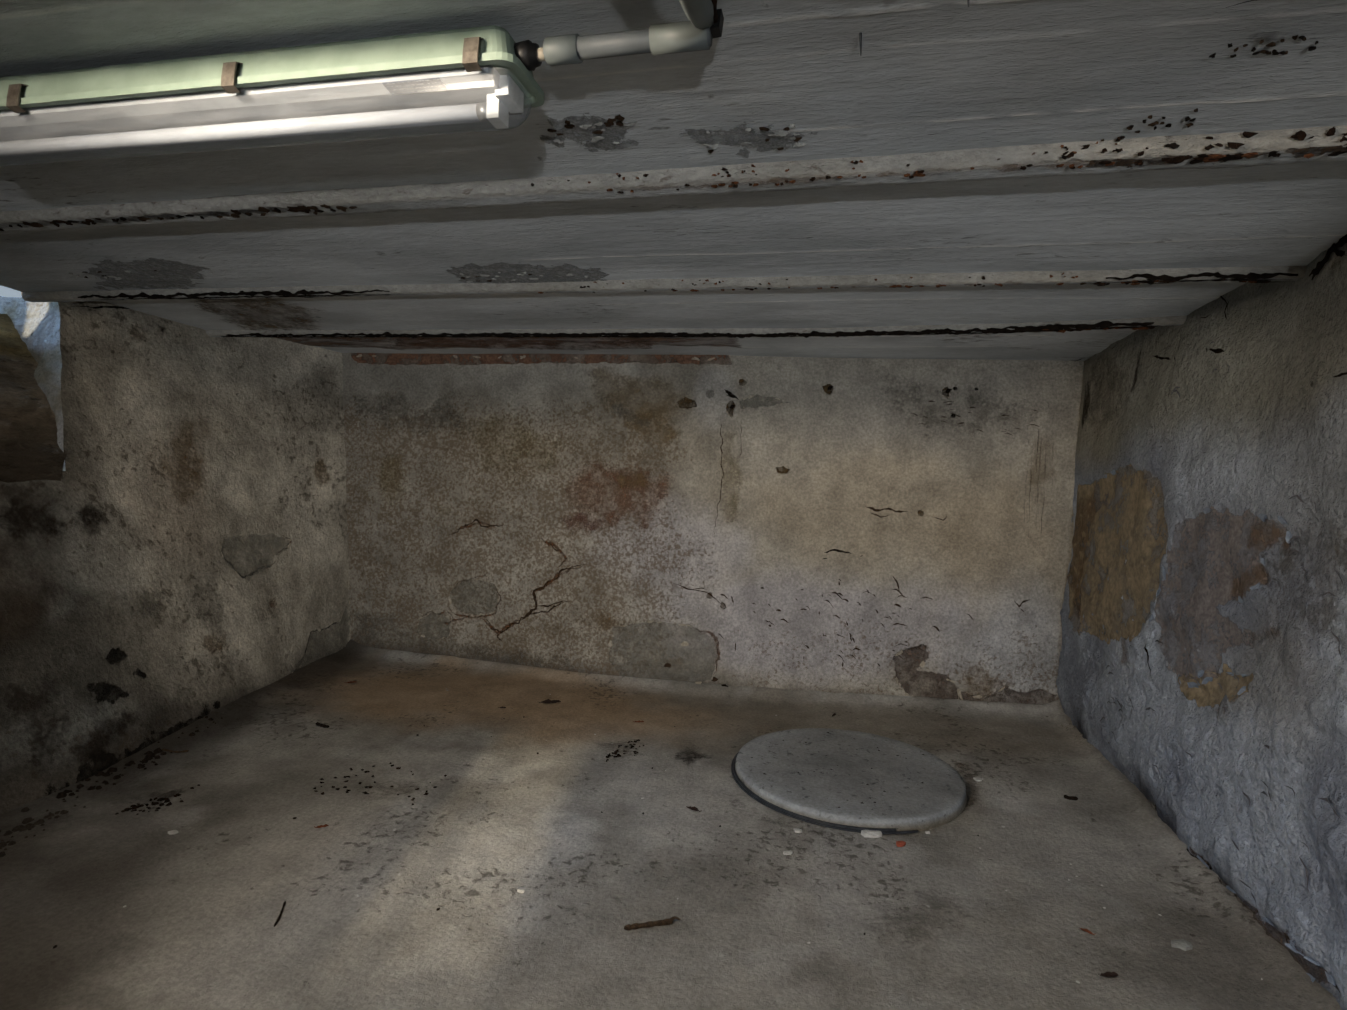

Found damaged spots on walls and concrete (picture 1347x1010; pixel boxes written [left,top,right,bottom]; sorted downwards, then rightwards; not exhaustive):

flaking render [1209,35,1318,58]
peeling [540,113,638,152]
peeling [685,122,817,158]
corrosion [607,160,925,193]
corrosion [997,145,1083,172]
peeling [447,263,609,284]
corrosion [671,279,771,292]
corrosion [563,463,669,531]
crack [450,519,505,535]
peeling [1067,464,1168,649]
crack [483,539,585,640]
flaking render [892,644,1057,704]